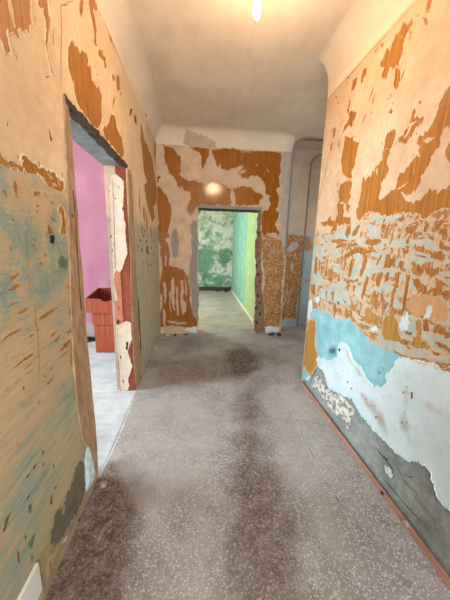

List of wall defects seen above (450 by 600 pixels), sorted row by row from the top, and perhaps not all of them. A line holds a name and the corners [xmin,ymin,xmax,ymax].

peeling [0,0,55,78]
peeling [0,150,65,196]
peeling [79,0,106,68]
peeling [67,38,125,159]
peeling [107,173,128,310]
peeling [129,108,312,333]
peeling [320,67,450,236]
peeling [374,0,433,114]
peeling [116,300,141,391]
flaking render [302,319,450,577]
flaking render [31,462,86,600]